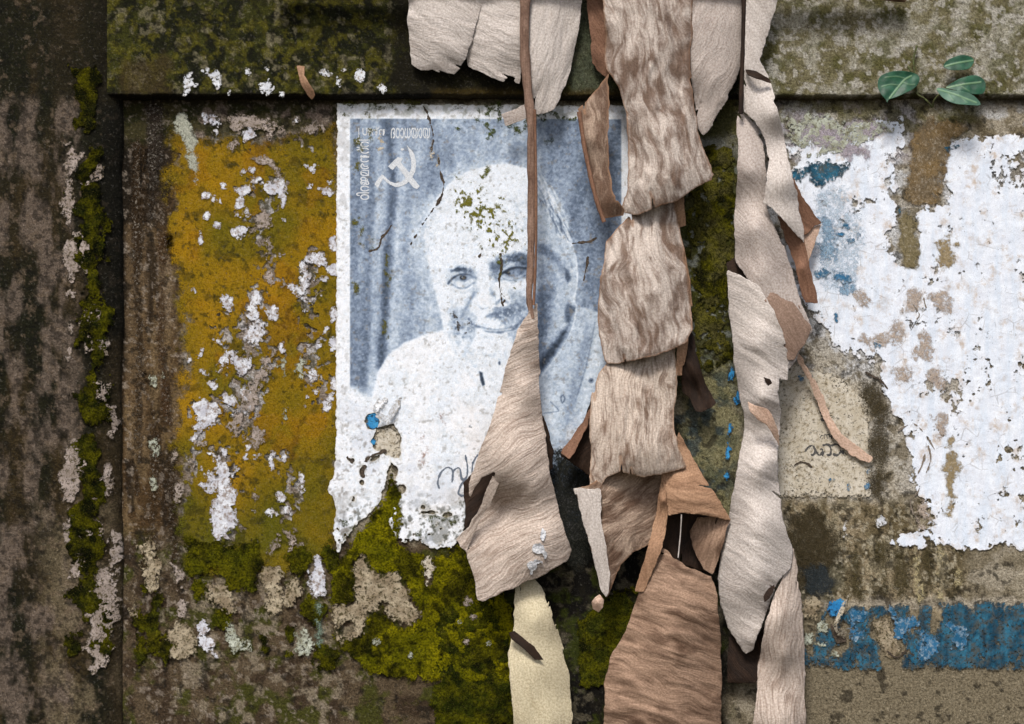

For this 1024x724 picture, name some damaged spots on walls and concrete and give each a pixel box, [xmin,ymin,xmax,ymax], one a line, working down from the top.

flaking render [201,112,325,153]
peeling [170,154,338,541]
peeling [785,111,1024,551]
leakage [314,603,324,648]
peeling [802,595,1024,672]